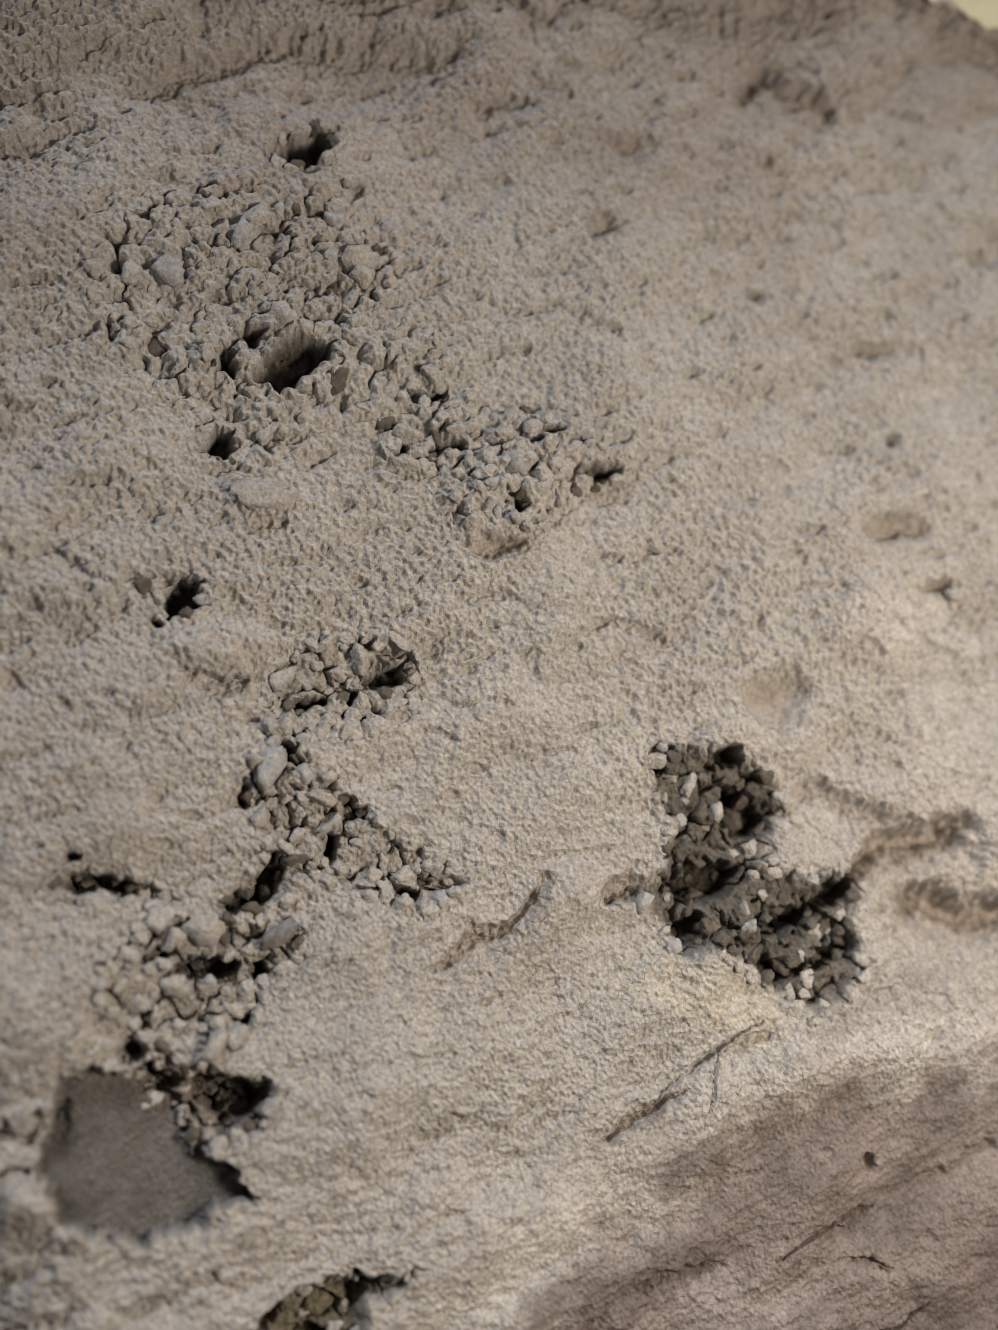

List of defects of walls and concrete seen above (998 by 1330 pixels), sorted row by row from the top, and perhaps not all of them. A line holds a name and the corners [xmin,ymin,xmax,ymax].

spalling [894,0,998,62]
spalling [732,68,835,134]
spalling [212,322,338,398]
spalling [196,422,244,470]
spalling [696,740,749,774]
spalling [717,782,777,842]
spalling [666,852,744,954]
spalling [756,877,853,944]
spalling [137,940,273,988]
spalling [755,931,865,986]
peeling [0,1013,278,1260]
spalling [328,1267,374,1314]